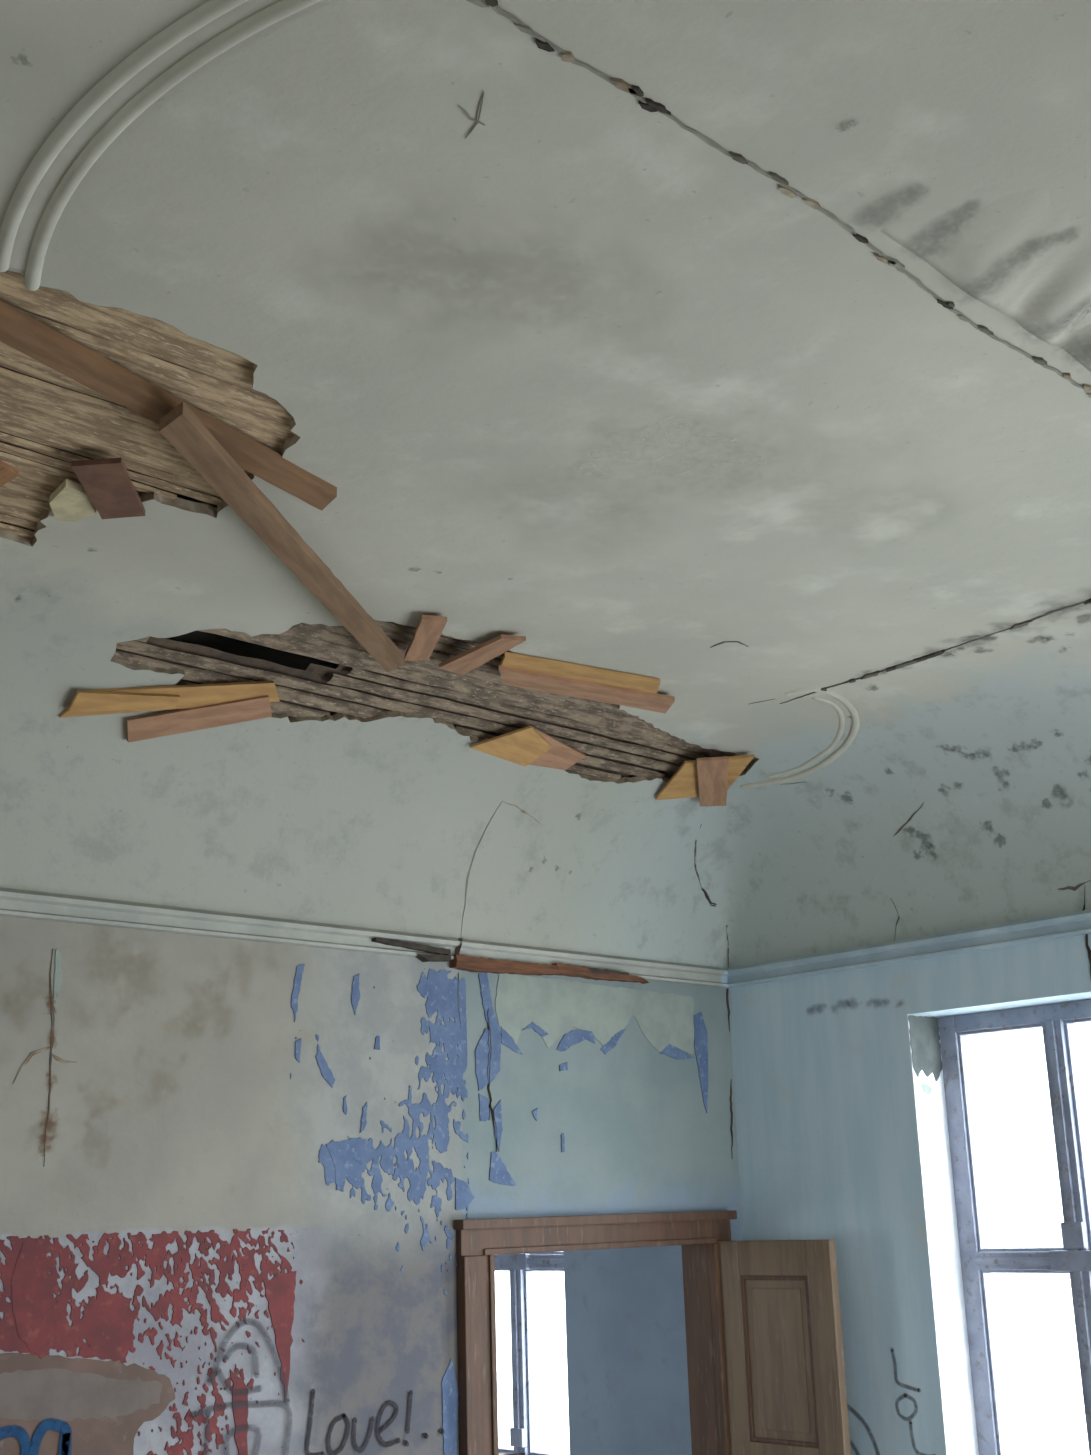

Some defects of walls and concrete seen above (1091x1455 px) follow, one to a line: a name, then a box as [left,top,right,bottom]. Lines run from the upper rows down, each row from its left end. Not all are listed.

crack [466,0,1091,398]
spalling [7,270,301,457]
flaking render [0,479,96,547]
spalling [138,492,228,518]
spalling [111,623,331,686]
crack [780,598,1091,704]
spalling [272,711,488,742]
spalling [565,769,670,784]
spalling [618,705,759,776]
peeling [290,938,708,1296]
peeling [0,1228,305,1455]
peeling [441,1358,459,1455]